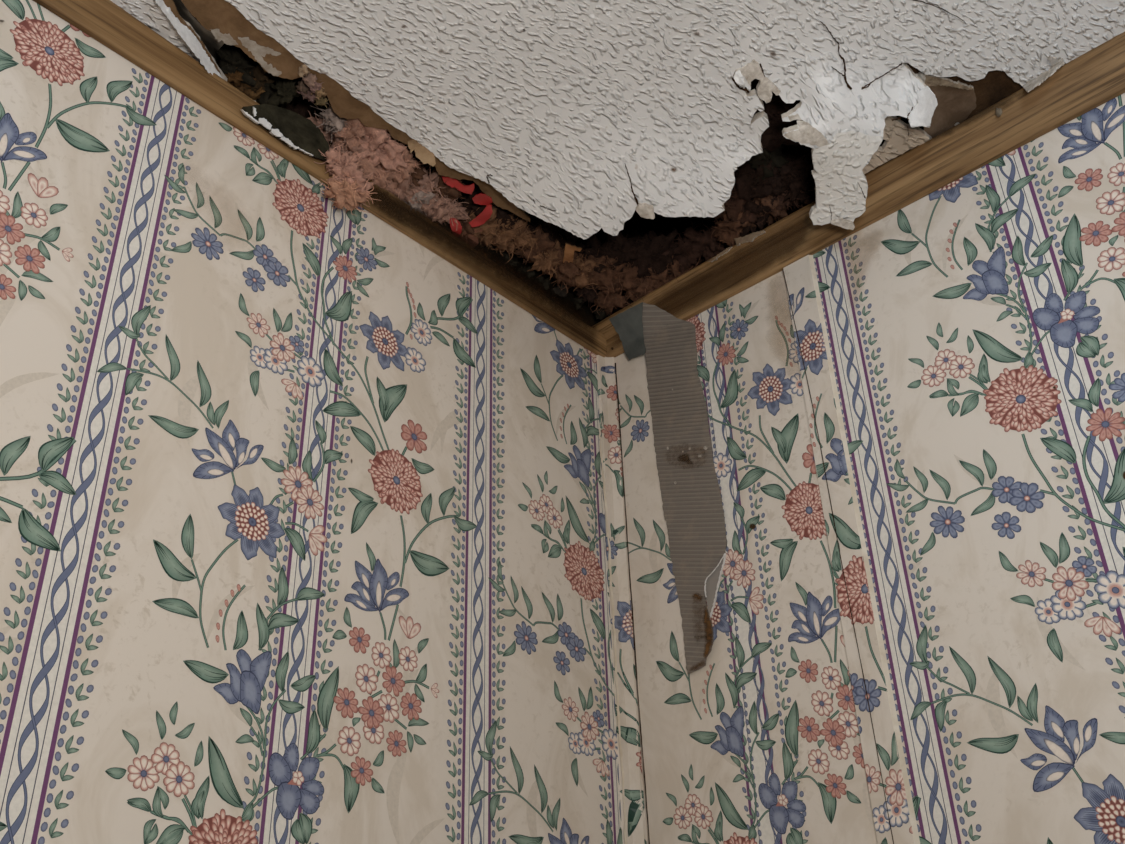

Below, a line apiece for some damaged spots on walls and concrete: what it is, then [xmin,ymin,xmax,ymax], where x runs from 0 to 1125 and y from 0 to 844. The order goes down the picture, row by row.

crack [820,21,902,90]
spalling [241,107,314,156]
peeling [740,0,938,230]
flaking render [636,203,655,219]